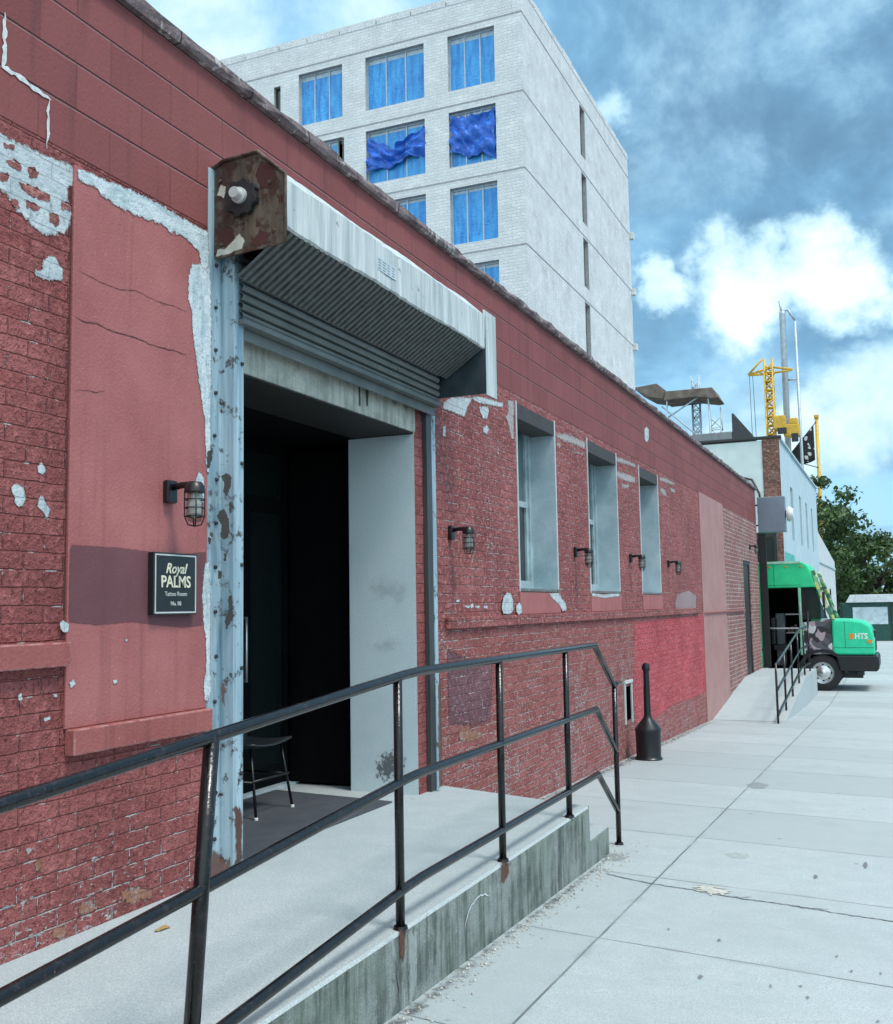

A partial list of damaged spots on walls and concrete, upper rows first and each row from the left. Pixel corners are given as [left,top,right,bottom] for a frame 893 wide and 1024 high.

crack [2,13,51,145]
corrosion [217,226,234,248]
flaking render [0,132,244,503]
crack [63,186,187,637]
peeling [442,396,514,439]
peeling [11,484,51,518]
corrosion [208,473,232,544]
peeling [202,561,212,701]
corrosion [225,595,233,630]
peeling [502,592,522,615]
damp [376,749,406,782]
corrosion [211,807,243,876]